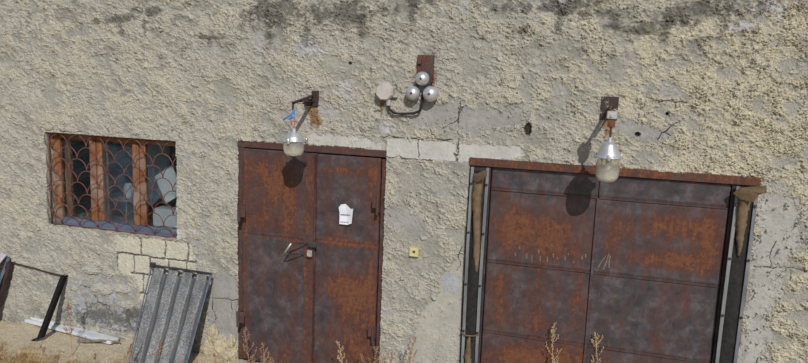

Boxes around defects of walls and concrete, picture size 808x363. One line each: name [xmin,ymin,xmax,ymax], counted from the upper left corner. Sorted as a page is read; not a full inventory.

flaking render [303,96,530,163]
crack [383,102,467,161]
flaking render [66,228,199,336]
crack [754,241,807,280]